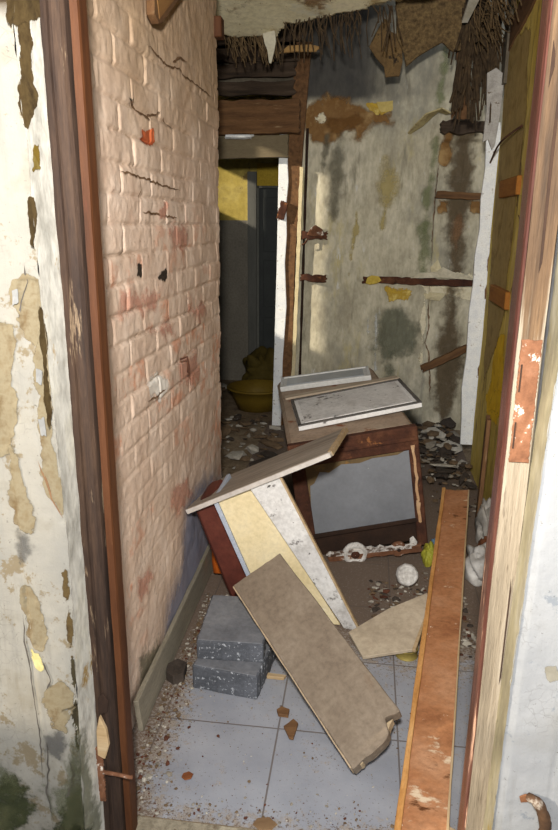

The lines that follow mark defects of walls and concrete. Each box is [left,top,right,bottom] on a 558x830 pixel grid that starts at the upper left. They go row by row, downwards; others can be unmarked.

flaking render [6,0,40,129]
peeling [366,101,393,115]
flaking render [32,145,41,172]
flaking render [27,196,37,248]
water stain [373,309,417,377]
peeling [0,266,64,560]